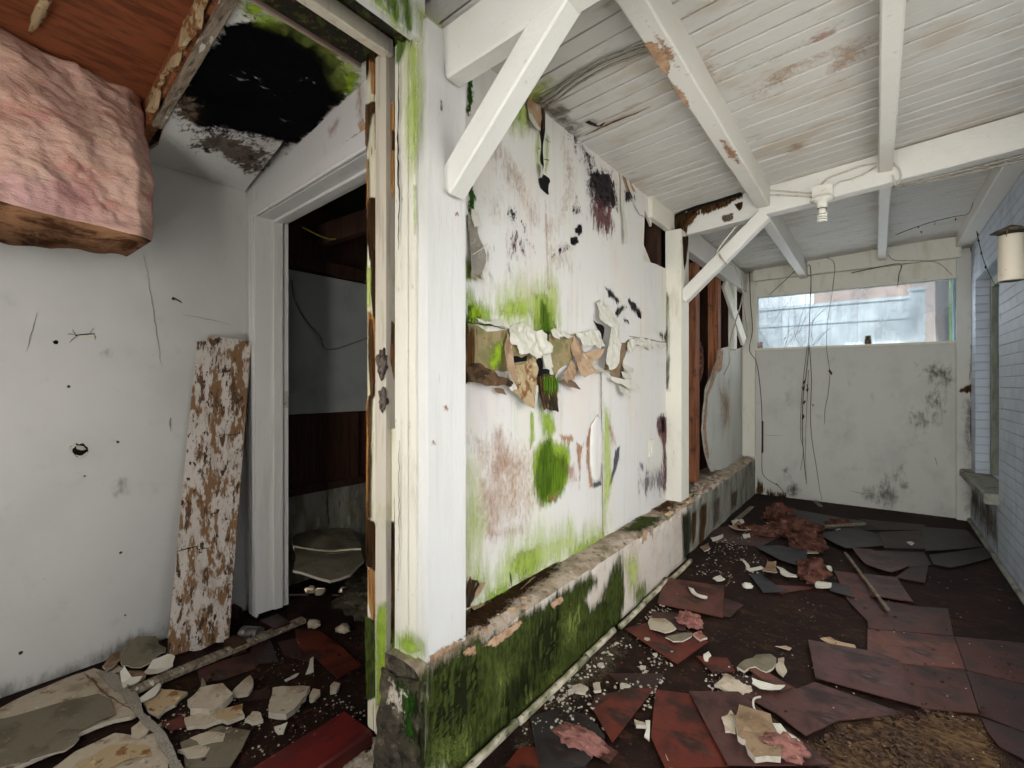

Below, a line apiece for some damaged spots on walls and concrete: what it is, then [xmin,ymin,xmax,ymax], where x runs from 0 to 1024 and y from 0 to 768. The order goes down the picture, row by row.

water stain [171,7,364,175]
water stain [531,86,619,257]
peeling [477,318,511,328]
water stain [490,374,620,507]
water stain [602,555,625,628]
spalling [427,621,522,665]
water stain [550,600,581,686]